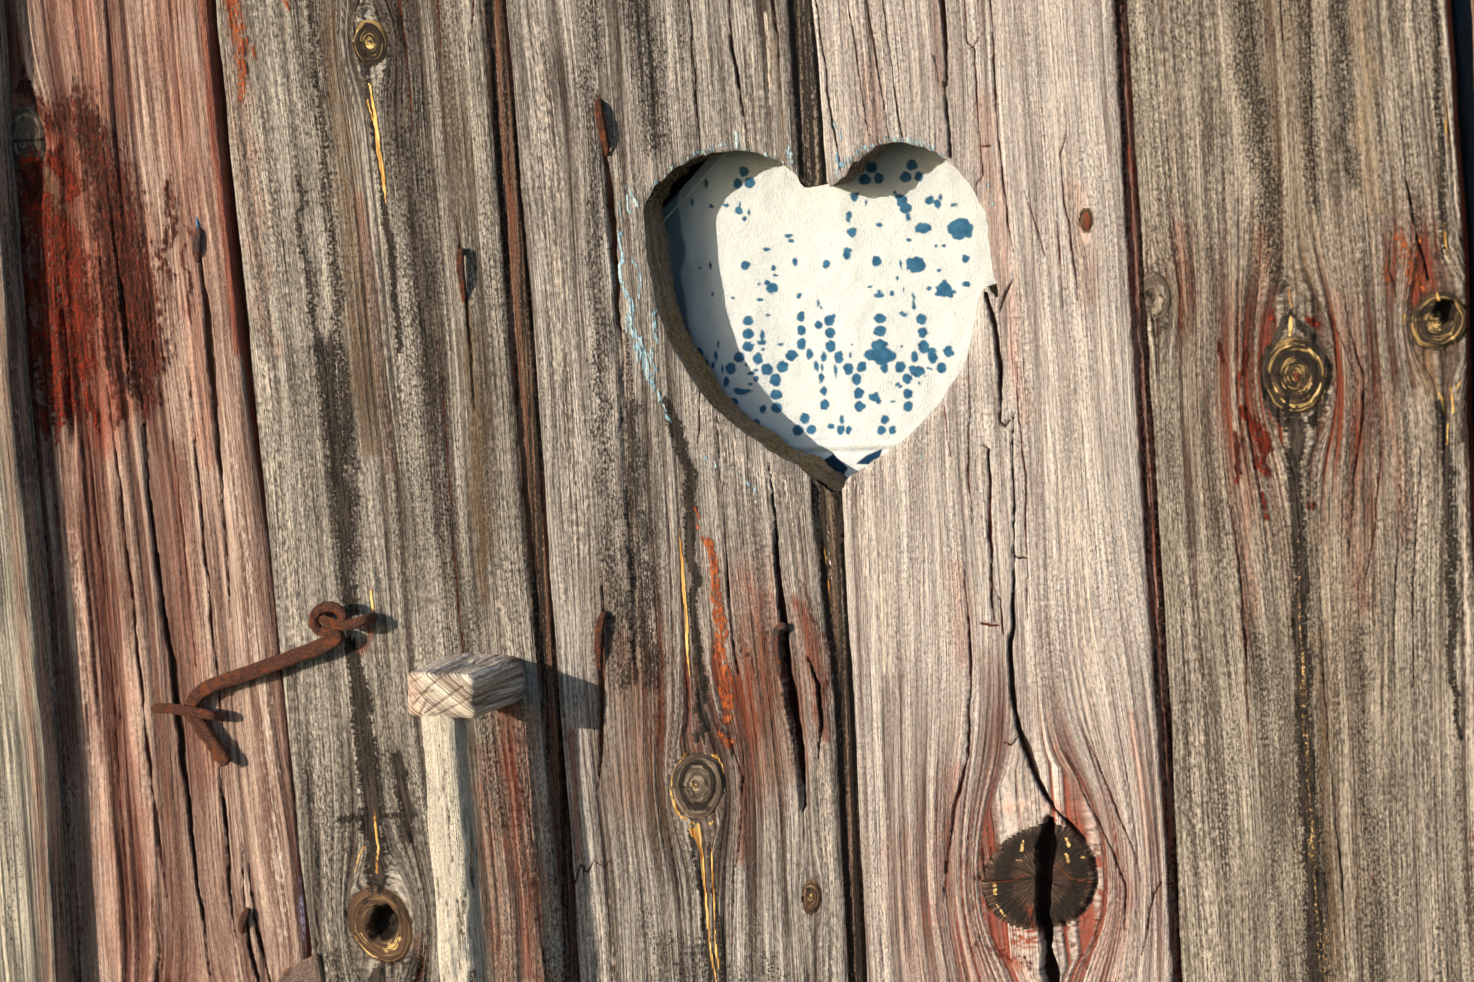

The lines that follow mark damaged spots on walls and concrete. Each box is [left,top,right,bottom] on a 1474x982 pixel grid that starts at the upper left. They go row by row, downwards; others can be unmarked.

crack [687,0,701,152]
crack [728,0,750,149]
crack [771,0,783,116]
crack [815,0,903,173]
crack [935,0,1172,982]
crack [696,388,824,828]
crack [727,732,744,946]